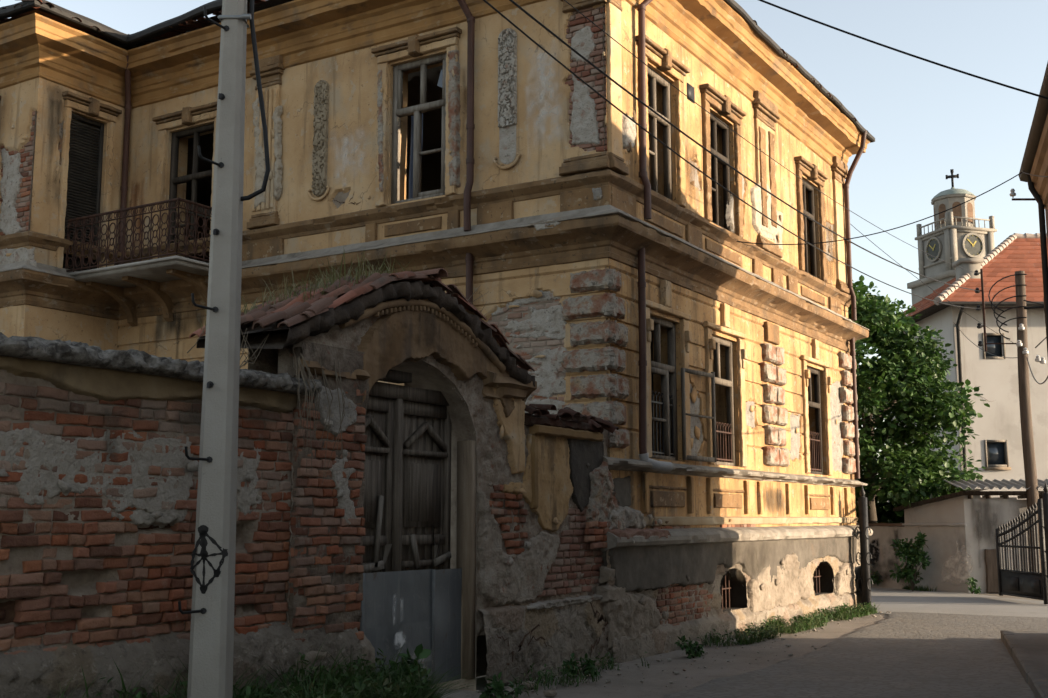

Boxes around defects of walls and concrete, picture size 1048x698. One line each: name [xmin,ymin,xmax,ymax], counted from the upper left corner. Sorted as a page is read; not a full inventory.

flaking render [565,4,607,152]
peeling [622,110,636,152]
flaking render [0,111,37,236]
peeling [0,247,37,267]
peeling [314,386,357,437]
peeling [690,384,703,456]
peeling [477,290,690,610]
spalling [0,598,26,624]
flaking render [656,575,713,626]